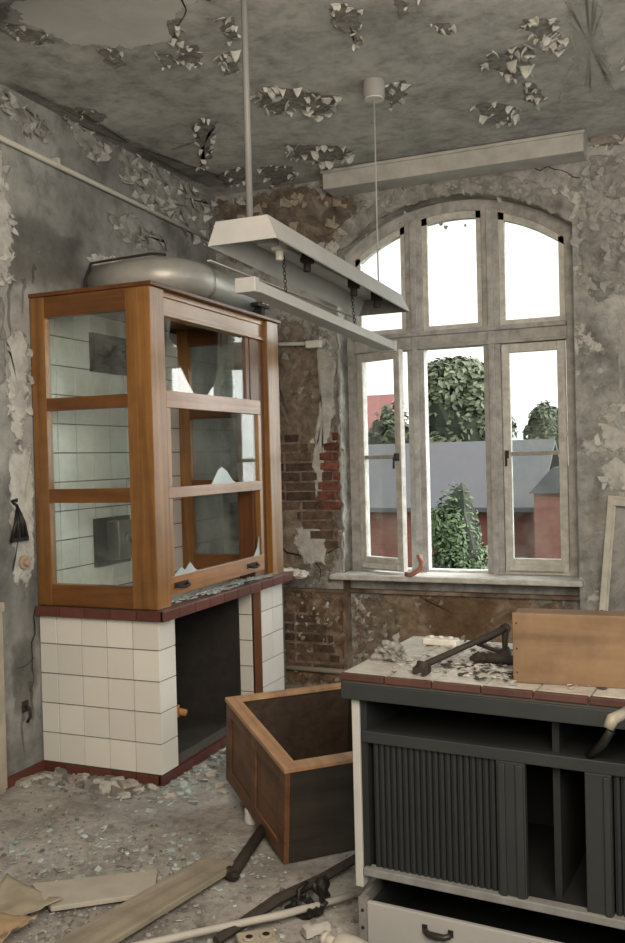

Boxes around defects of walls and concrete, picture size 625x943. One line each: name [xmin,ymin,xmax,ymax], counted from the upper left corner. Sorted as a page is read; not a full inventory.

flaking render [2,0,241,76]
peeling [250,86,344,123]
peeling [330,3,364,52]
peeling [470,16,569,129]
flaking render [0,138,19,286]
flaking render [63,107,625,305]
peeling [5,328,34,452]
flaking render [276,311,578,686]
peeling [594,402,625,492]